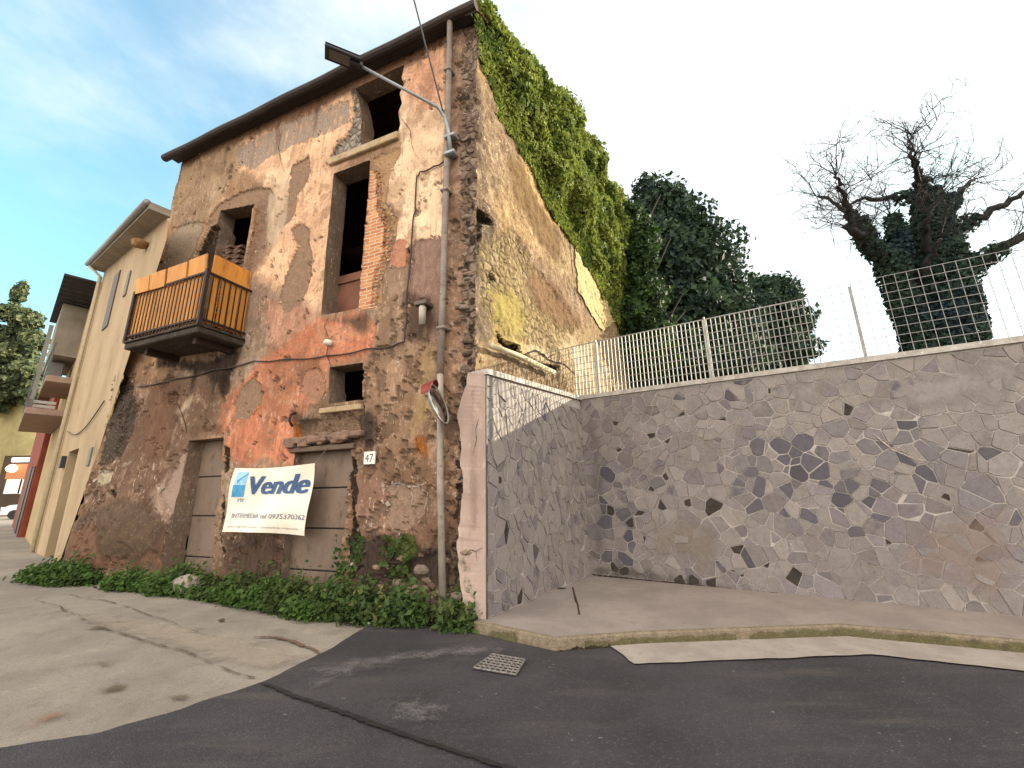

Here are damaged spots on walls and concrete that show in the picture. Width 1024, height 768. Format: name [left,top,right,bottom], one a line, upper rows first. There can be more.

flaking render [161,87,362,313]
flaking render [359,147,441,342]
spalling [449,22,578,600]
flaking render [93,375,137,498]
flaking render [348,456,361,565]